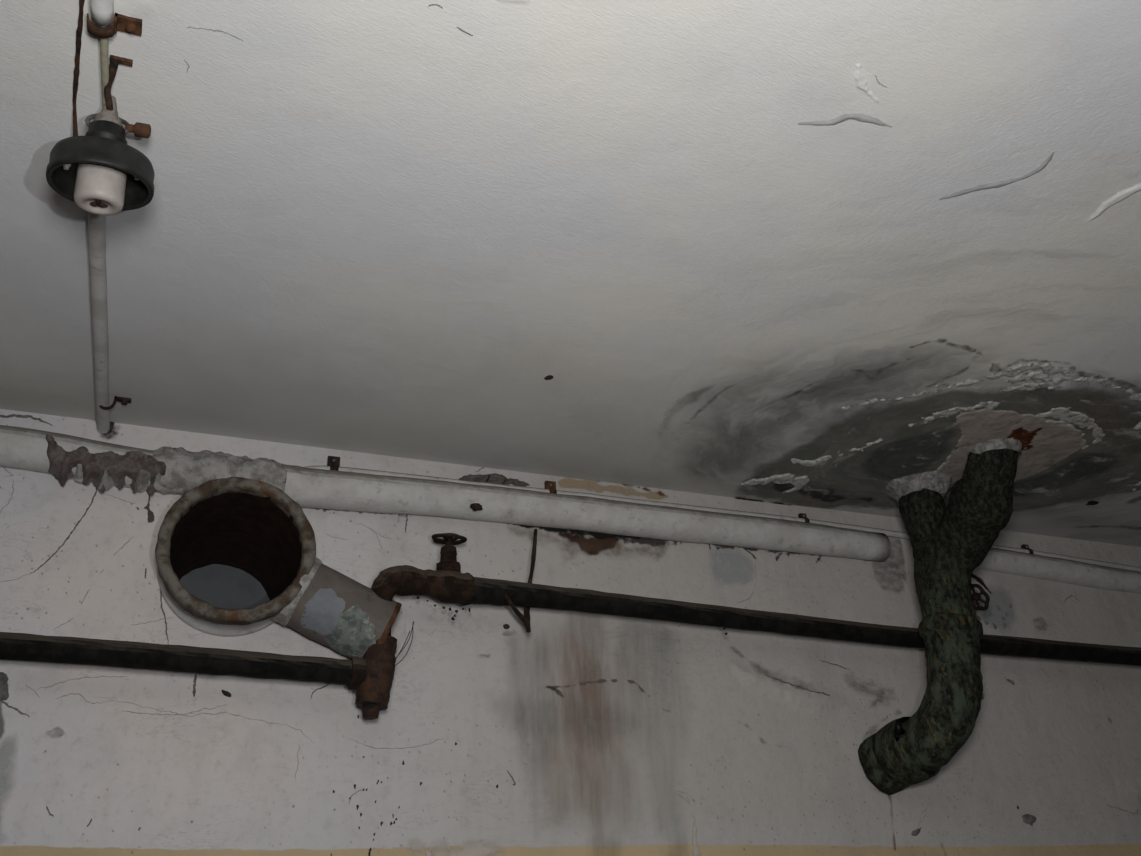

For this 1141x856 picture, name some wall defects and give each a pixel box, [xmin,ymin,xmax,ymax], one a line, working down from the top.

peeling [1083,183,1141,224]
damp [742,358,1141,511]
flaking render [0,672,9,701]